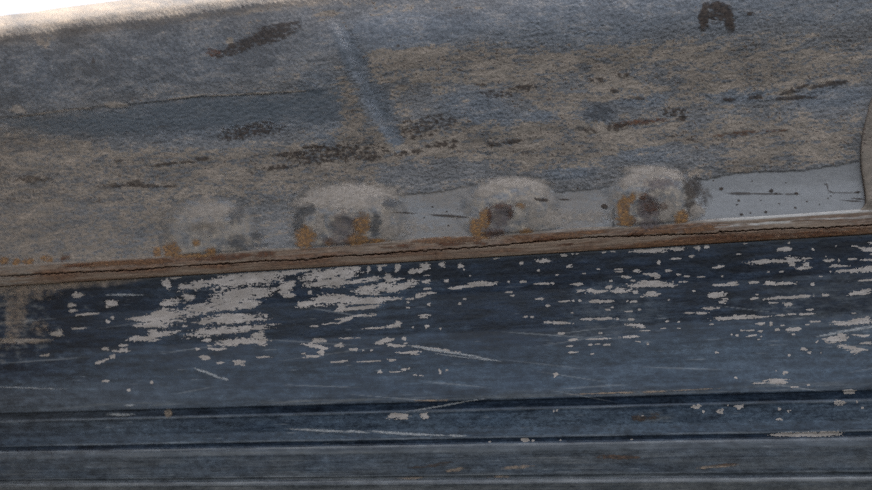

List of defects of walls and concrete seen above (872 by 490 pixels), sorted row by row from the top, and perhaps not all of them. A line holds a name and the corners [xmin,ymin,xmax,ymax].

peeling [0,327,85,344]
peeling [68,291,119,324]
peeling [95,262,460,376]
peeling [444,253,579,305]
peeling [535,245,710,355]
peeling [661,241,872,355]
peeling [753,370,810,388]